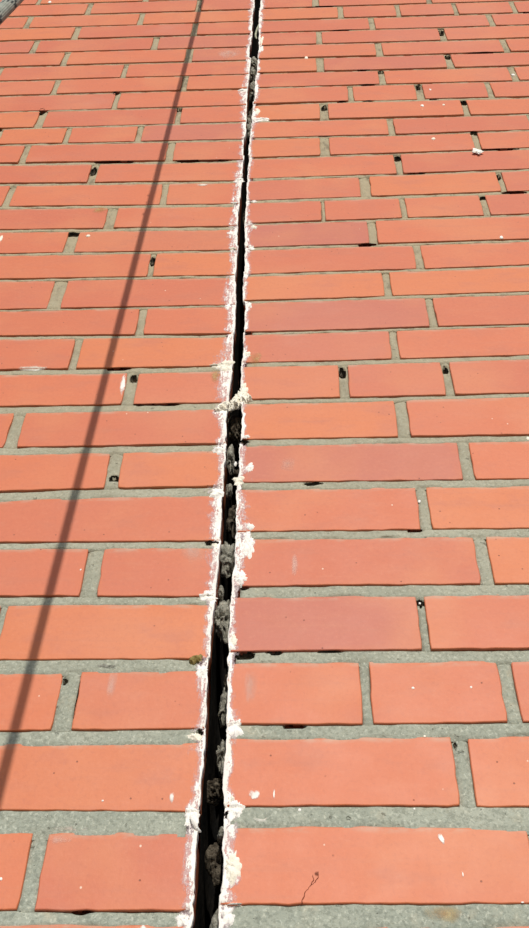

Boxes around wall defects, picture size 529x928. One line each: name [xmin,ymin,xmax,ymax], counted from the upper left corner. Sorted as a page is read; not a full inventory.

crack [194,0,264,928]